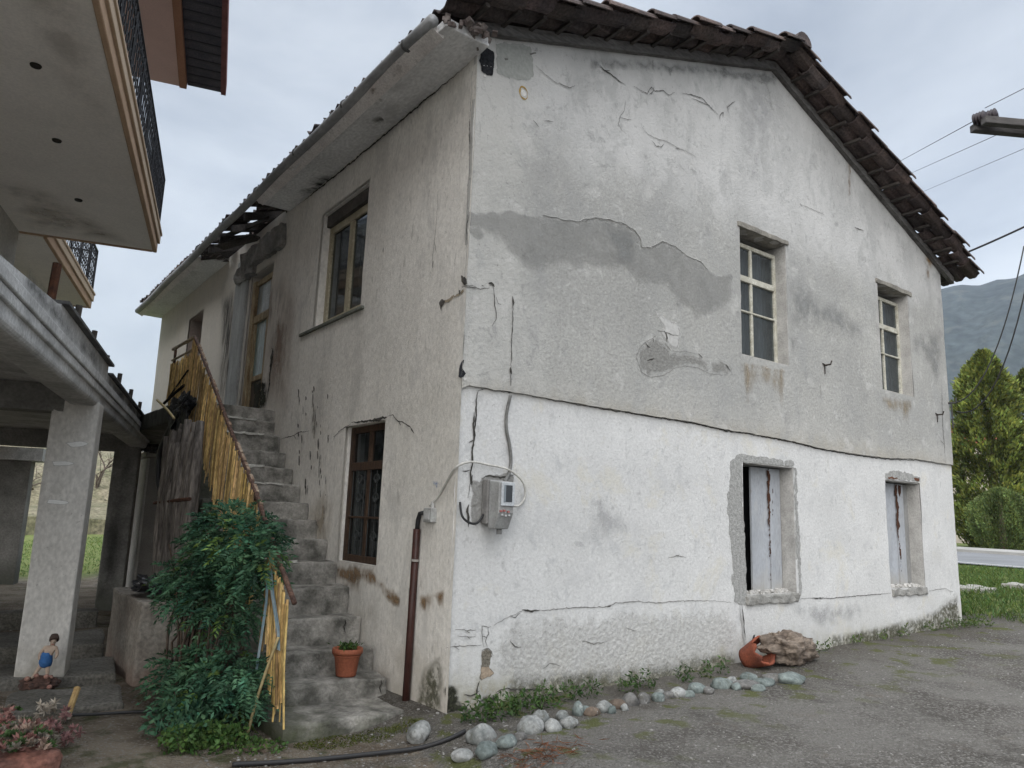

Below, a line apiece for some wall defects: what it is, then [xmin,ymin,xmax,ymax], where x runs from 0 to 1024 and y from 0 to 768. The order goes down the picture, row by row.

crack [304,65,946,527]
spalling [636,336,732,377]
rust [894,485,902,571]
damp [338,567,376,584]
crack [447,600,731,649]
spalling [480,616,731,681]